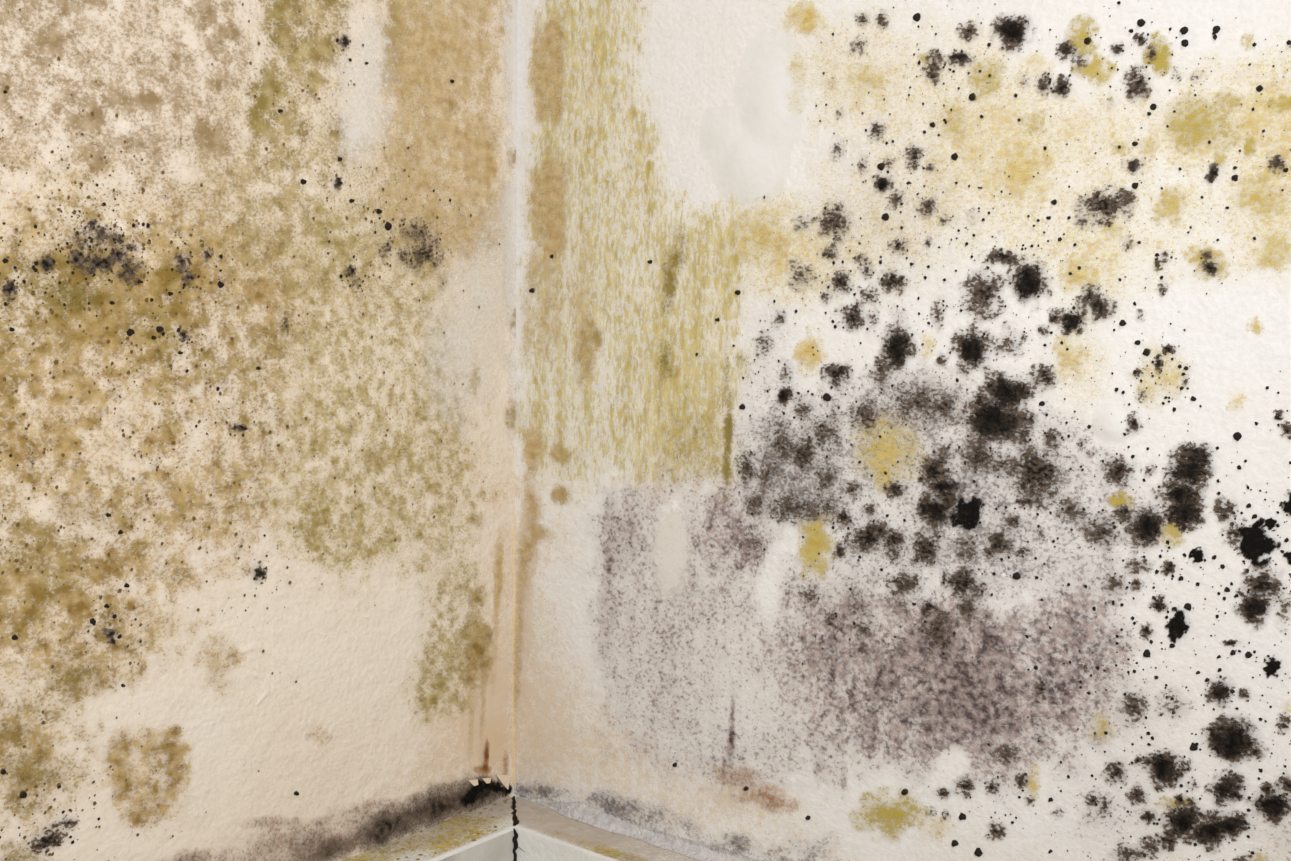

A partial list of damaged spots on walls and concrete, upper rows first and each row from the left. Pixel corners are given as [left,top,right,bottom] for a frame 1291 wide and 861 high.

damp [0,0,516,861]
peeling [468,775,510,789]
crack [511,796,523,861]
damp [506,0,1291,861]